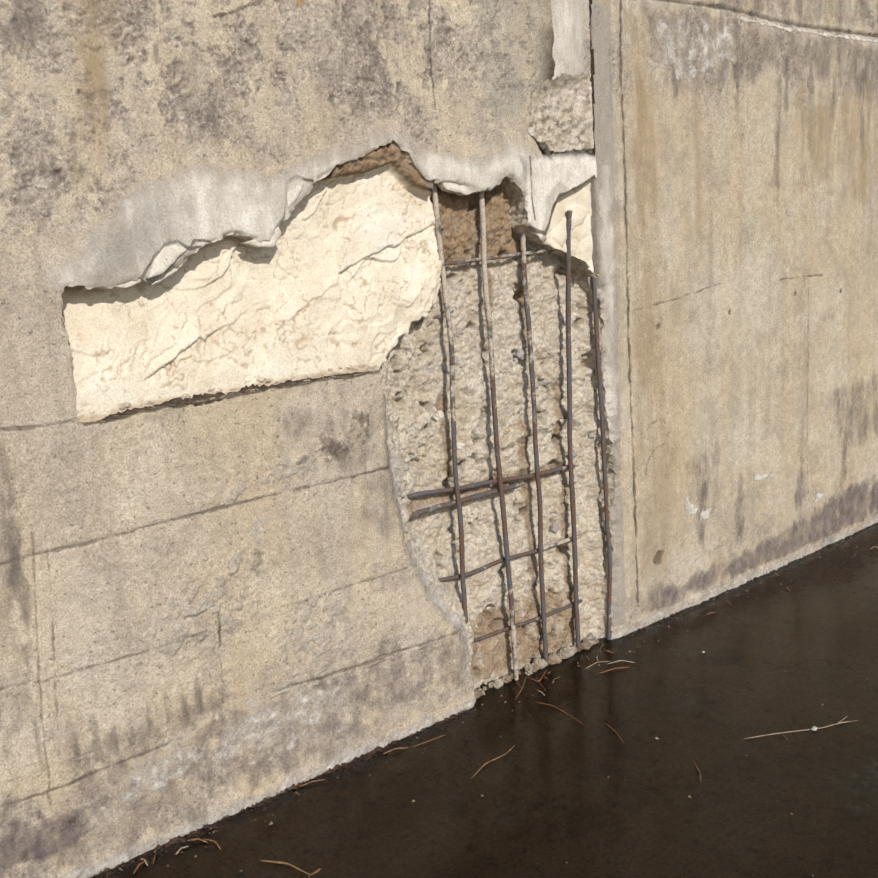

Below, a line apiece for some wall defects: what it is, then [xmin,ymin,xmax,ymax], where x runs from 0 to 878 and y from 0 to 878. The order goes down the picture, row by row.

crack [696,3,878,42]
rust [316,143,528,288]
spalling [55,0,616,690]
crack [32,536,97,554]
crack [177,494,274,519]
rust [495,438,535,550]
rust [470,546,575,679]
leakage [611,483,878,642]
leakage [216,686,339,756]
leakage [0,815,79,868]
leakage [62,699,476,878]